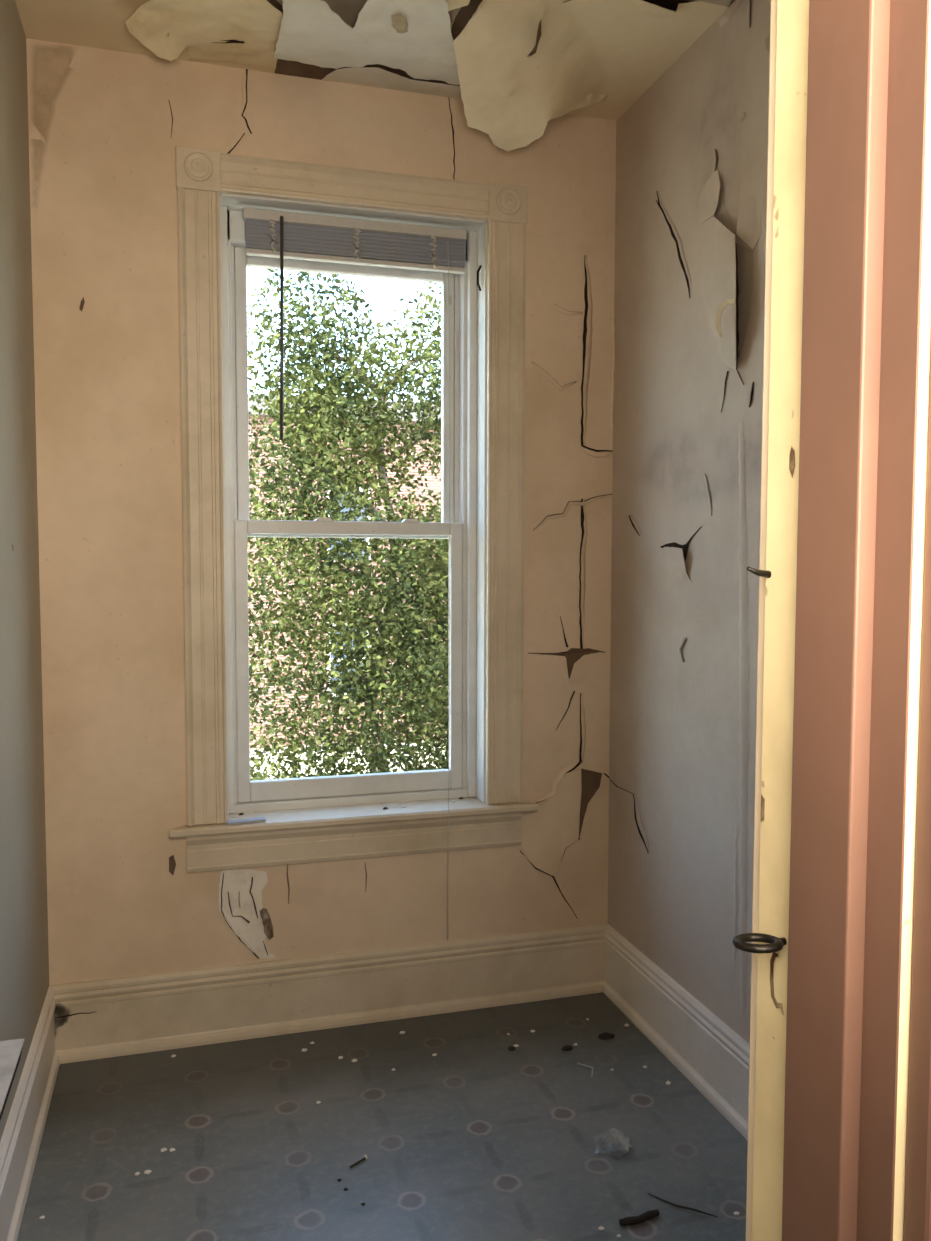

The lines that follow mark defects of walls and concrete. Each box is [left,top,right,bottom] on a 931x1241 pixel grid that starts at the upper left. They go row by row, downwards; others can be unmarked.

crack [226,69,252,154]
peeling [125,0,618,152]
crack [656,191,692,298]
crack [530,255,613,458]
crack [520,494,650,919]
spalling [219,869,275,959]